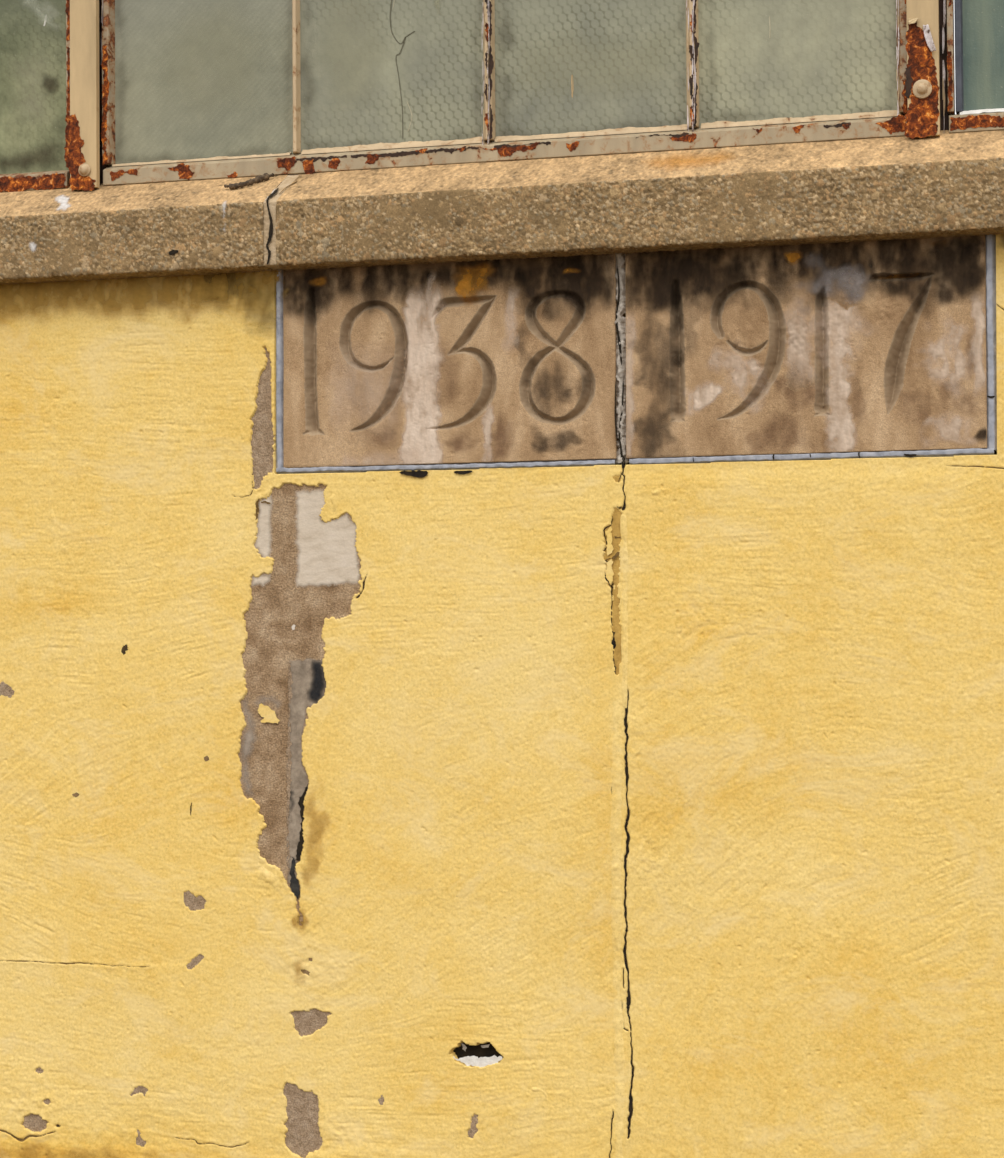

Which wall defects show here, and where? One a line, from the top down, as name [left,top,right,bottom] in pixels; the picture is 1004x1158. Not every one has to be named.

rust [0,0,96,192]
rust [876,22,1004,139]
crack [266,181,297,264]
rust [276,156,340,174]
leakage [626,246,756,310]
leakage [0,254,611,464]
leakage [769,236,985,451]
crack [946,463,1004,471]
flaking render [238,348,362,926]
crack [609,689,634,1158]
hole [453,1042,503,1067]
spalling [283,1082,323,1158]